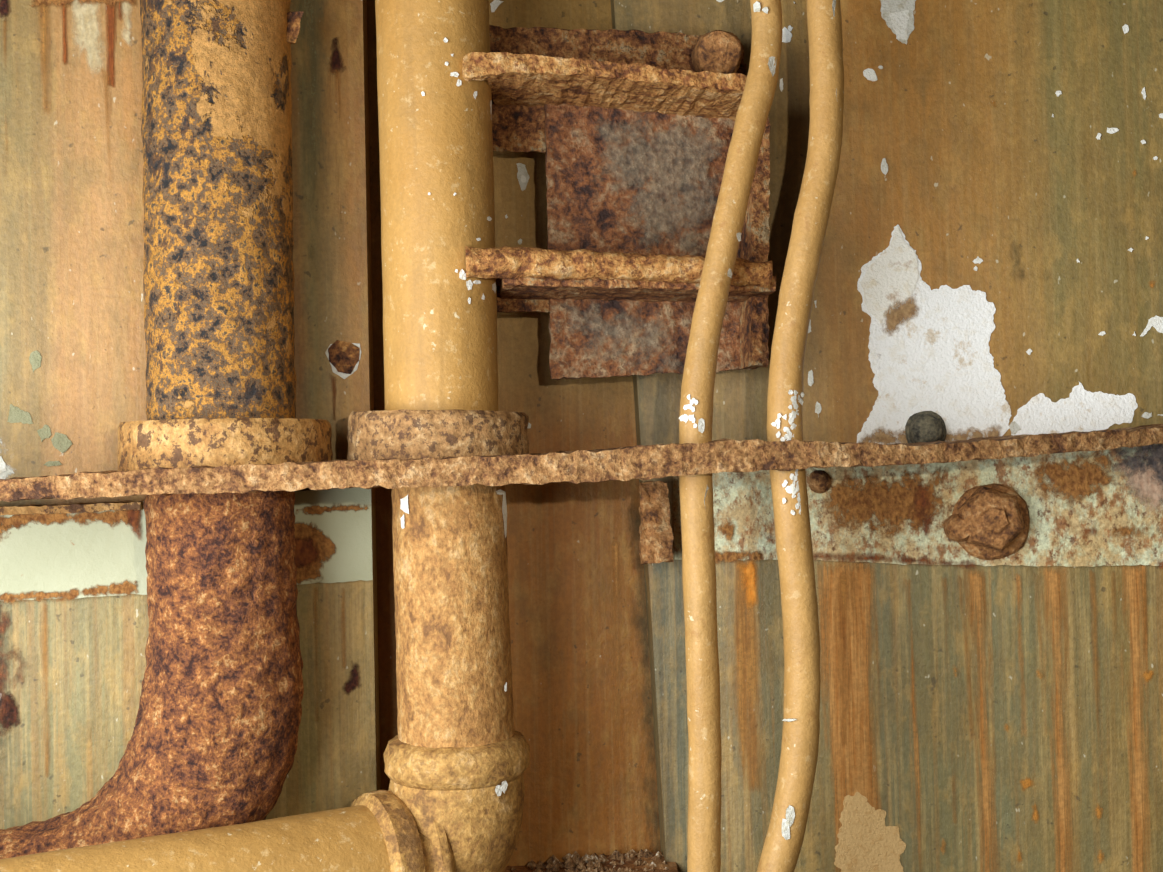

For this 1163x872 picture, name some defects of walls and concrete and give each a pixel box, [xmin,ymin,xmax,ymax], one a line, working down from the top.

rust [31,0,135,87]
peeling [880,0,916,44]
peeling [857,225,1163,445]
peeling [7,404,72,467]
rust [818,468,949,535]
rust [1034,454,1115,504]
rust [1113,526,1148,537]
rust [813,553,884,845]
rust [899,556,993,872]
rust [1045,568,1069,872]
rust [1123,562,1163,872]
peeling [834,792,906,872]